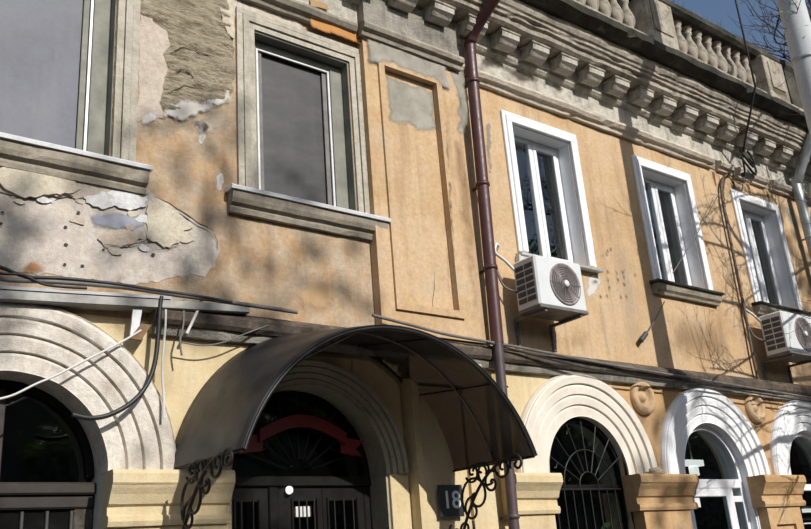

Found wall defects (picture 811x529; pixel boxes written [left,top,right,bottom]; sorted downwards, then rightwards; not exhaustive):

spalling [140,0,235,120]
peeling [368,39,469,133]
flaking render [0,166,219,285]